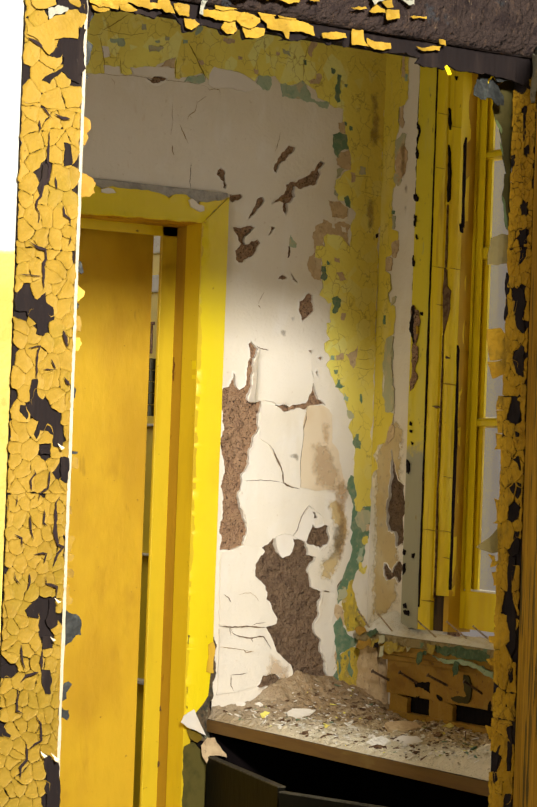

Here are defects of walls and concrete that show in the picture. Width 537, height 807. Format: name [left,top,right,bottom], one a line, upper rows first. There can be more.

peeling [87,0,531,106]
peeling [86,10,410,695]
peeling [409,305,421,391]
peeling [0,0,96,807]
crack [248,416,307,489]
peeling [414,78,537,807]
crack [222,622,271,653]
peeling [181,709,227,763]
spalling [366,721,423,749]